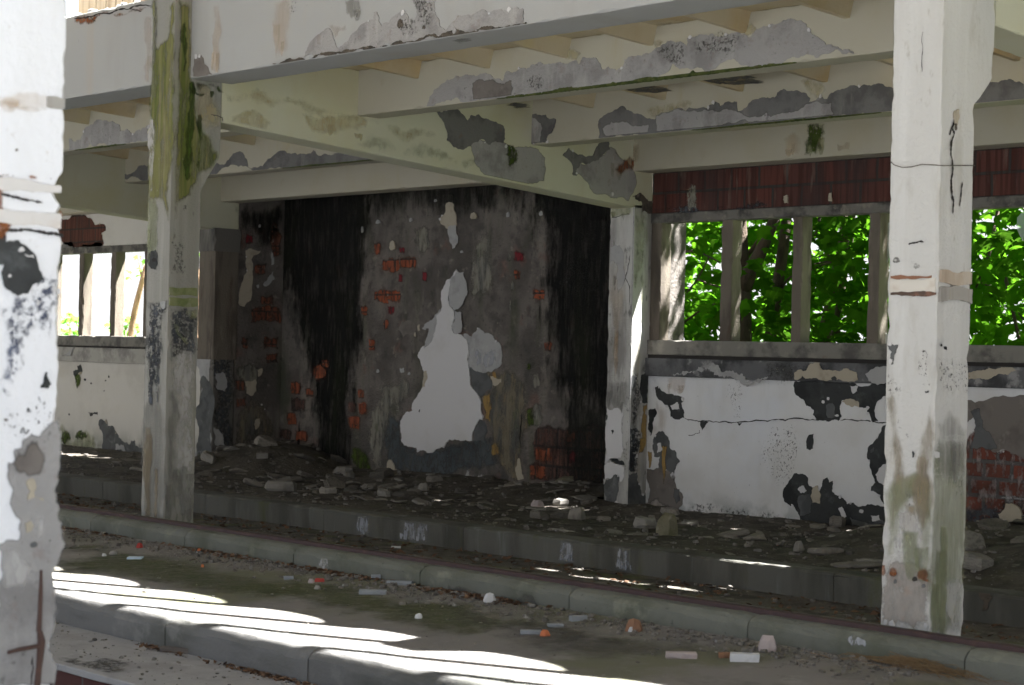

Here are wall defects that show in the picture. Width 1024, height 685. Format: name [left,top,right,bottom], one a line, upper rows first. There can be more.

peeling [273,0,527,64]
peeling [427,18,854,184]
peeling [976,79,1024,103]
crack [949,121,963,213]
peeling [0,233,61,394]
peeling [530,83,894,527]
peeling [98,419,143,453]
crack [685,417,817,436]
flaking render [965,395,1024,522]